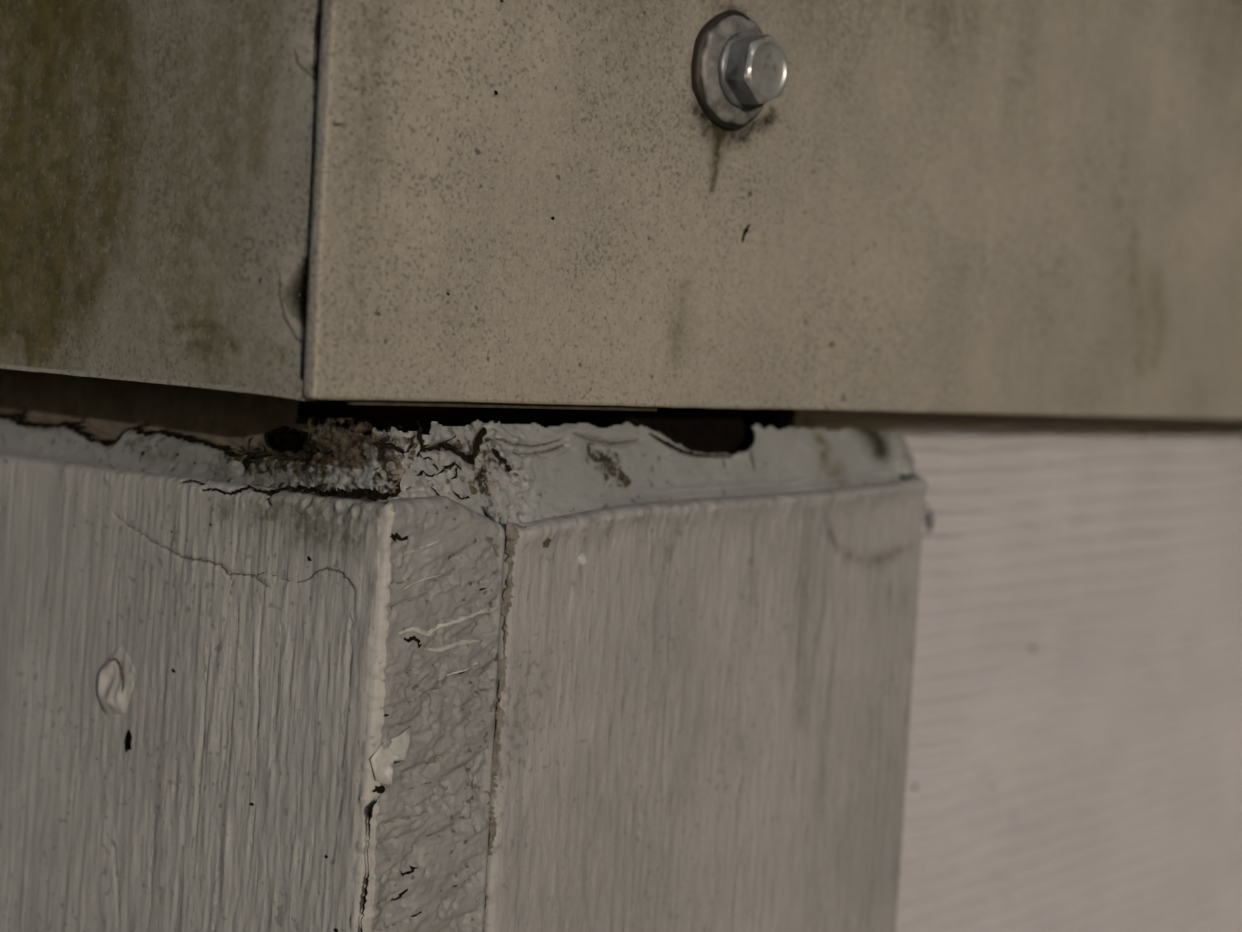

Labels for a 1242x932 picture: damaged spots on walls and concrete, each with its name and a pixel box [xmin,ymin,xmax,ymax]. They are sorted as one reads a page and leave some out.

peeling [375,457,520,496]
crack [113,512,381,932]